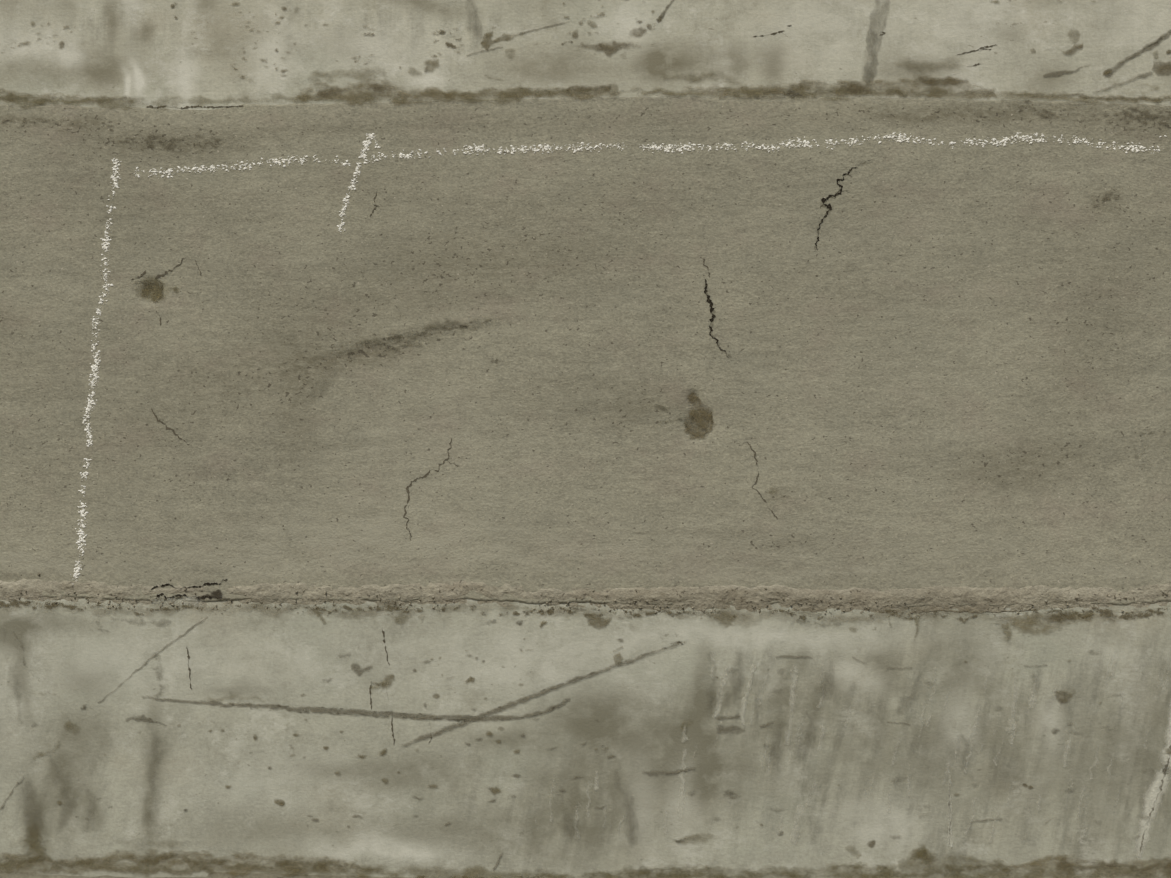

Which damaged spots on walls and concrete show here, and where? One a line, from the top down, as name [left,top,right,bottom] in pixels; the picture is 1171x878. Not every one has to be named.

water stain [1157,50,1171,74]
crack [815,160,871,250]
crack [703,259,729,358]
crack [403,438,457,541]